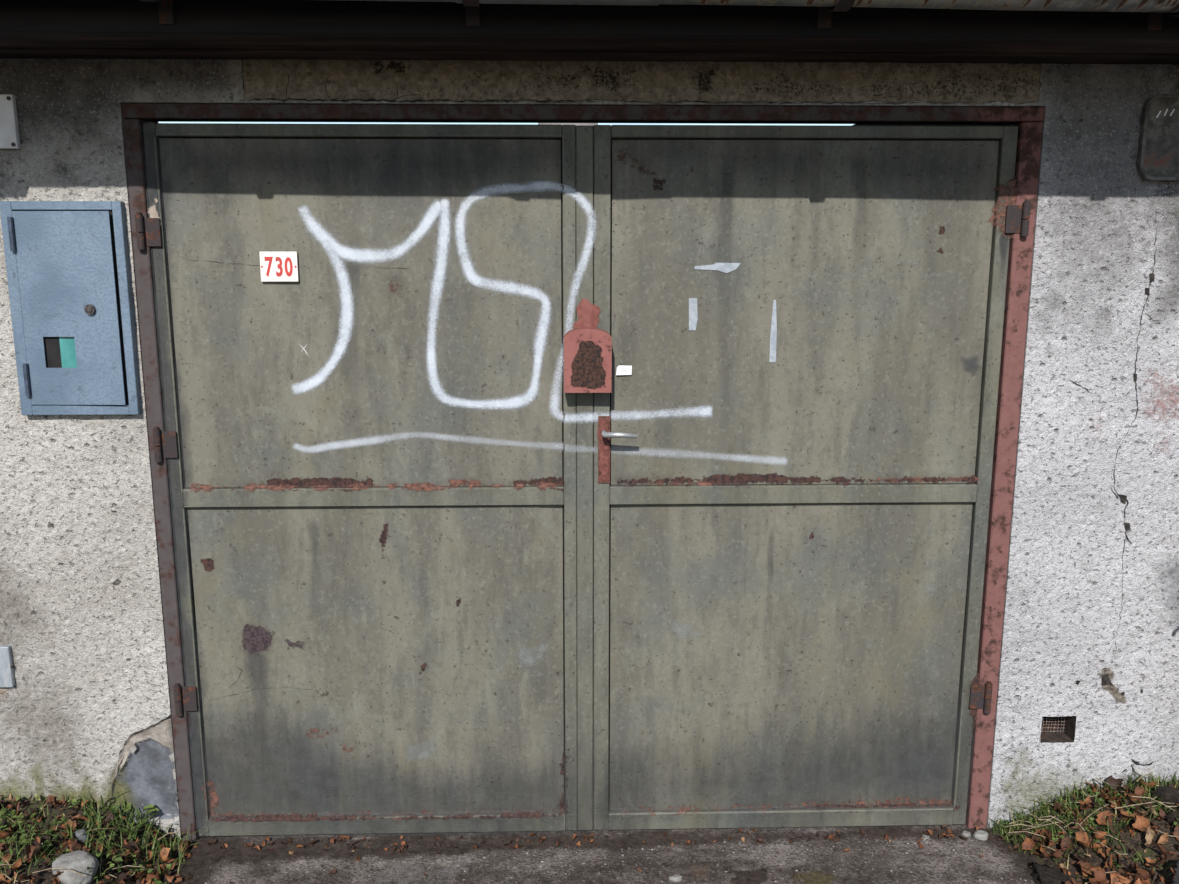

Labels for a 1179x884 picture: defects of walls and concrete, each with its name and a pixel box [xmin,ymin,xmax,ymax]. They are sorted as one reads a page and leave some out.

damp [1045,67,1157,214]
damp [1160,181,1179,307]
corrosion [570,340,606,389]
crack [1111,221,1161,651]
corrosion [190,476,563,492]
corrosion [617,472,978,487]
corrosion [242,624,272,653]
spalling [1101,668,1126,703]
spalling [109,714,178,820]